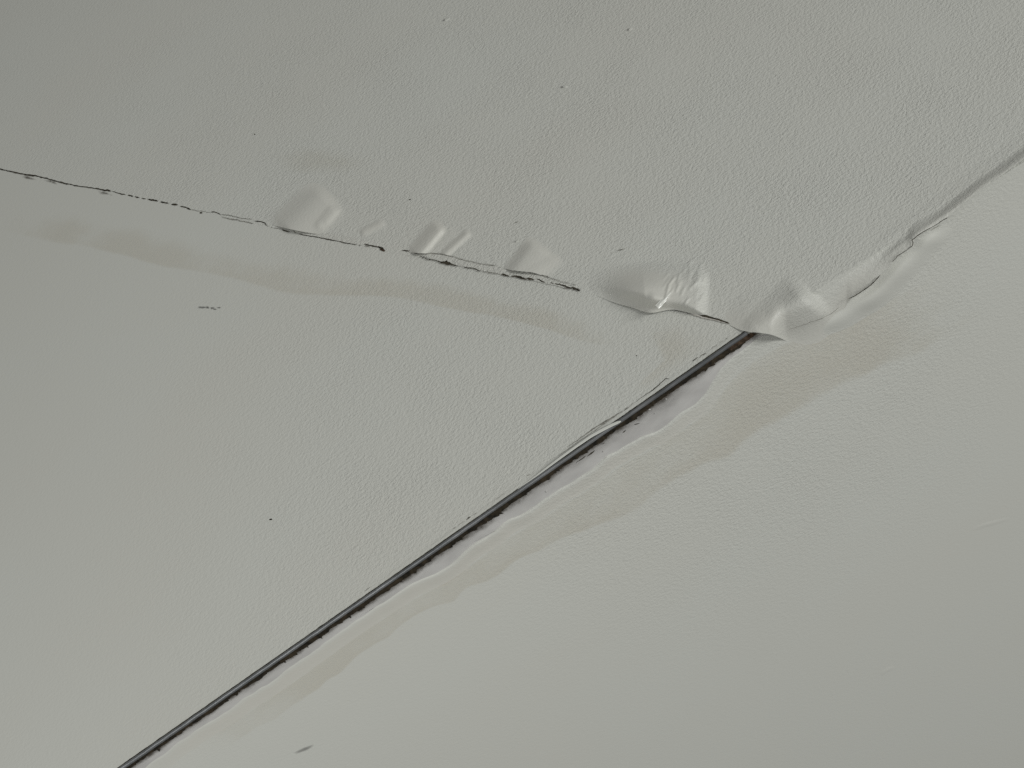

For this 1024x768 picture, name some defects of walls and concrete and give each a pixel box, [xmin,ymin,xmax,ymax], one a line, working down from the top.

crack [0,168,580,291]
crack [676,310,730,324]
crack [789,218,947,330]